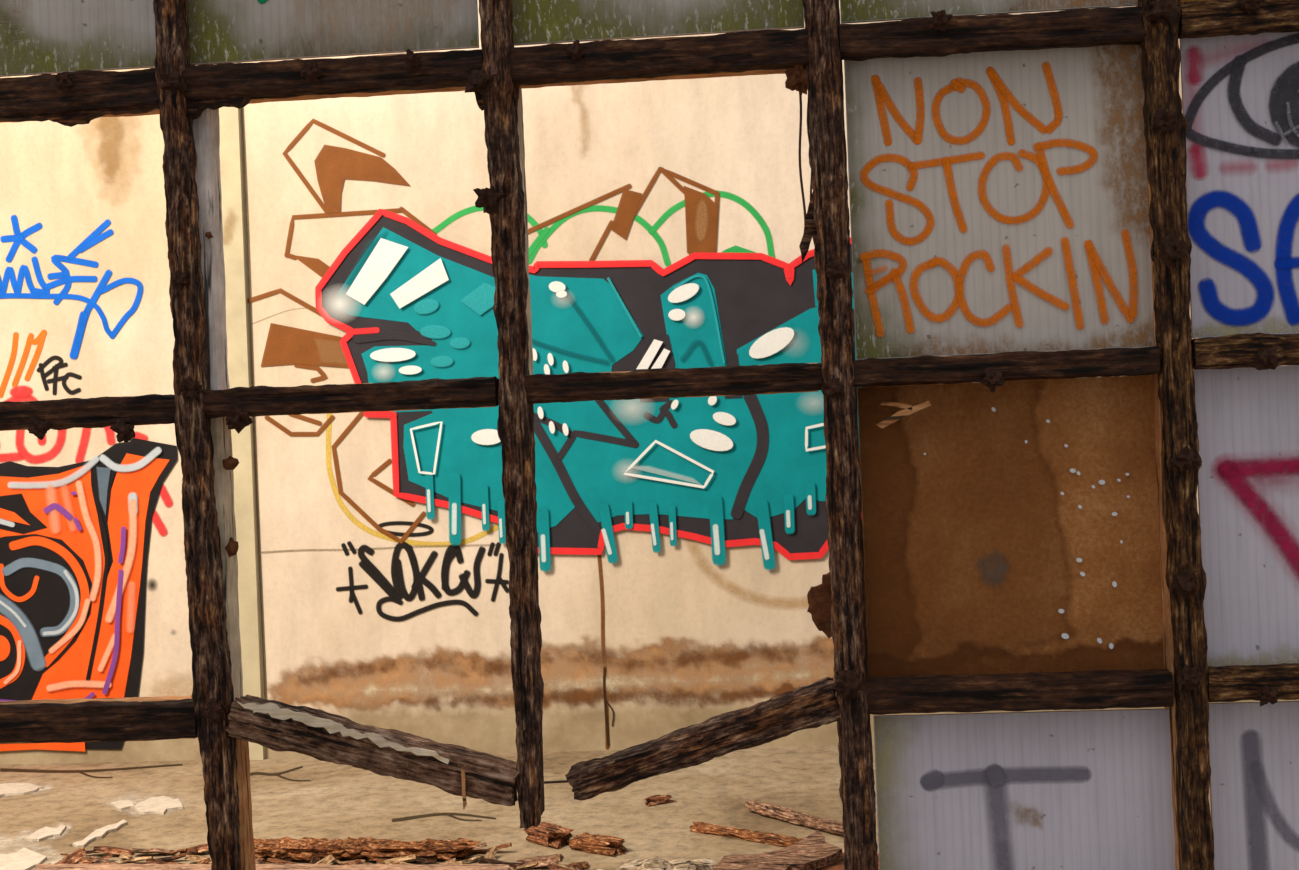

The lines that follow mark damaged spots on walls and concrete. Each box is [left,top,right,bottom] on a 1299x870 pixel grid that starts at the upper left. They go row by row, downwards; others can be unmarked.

damp [270,649,514,710]
damp [540,637,834,708]